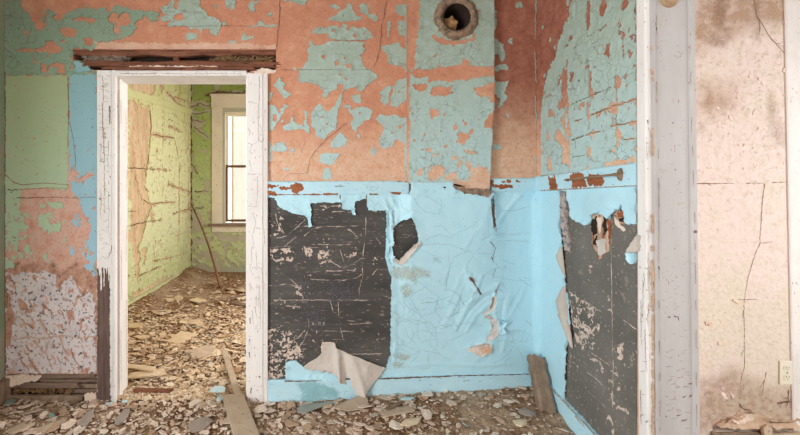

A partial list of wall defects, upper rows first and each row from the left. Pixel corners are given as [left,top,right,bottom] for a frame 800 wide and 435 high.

peeling [254,0,520,189]
peeling [540,0,637,190]
peeling [4,0,277,405]
peeling [258,326,305,379]
peeling [270,248,303,265]
crack [369,197,531,380]
peeling [570,292,629,415]
spalling [589,207,626,273]
crack [572,66,794,429]